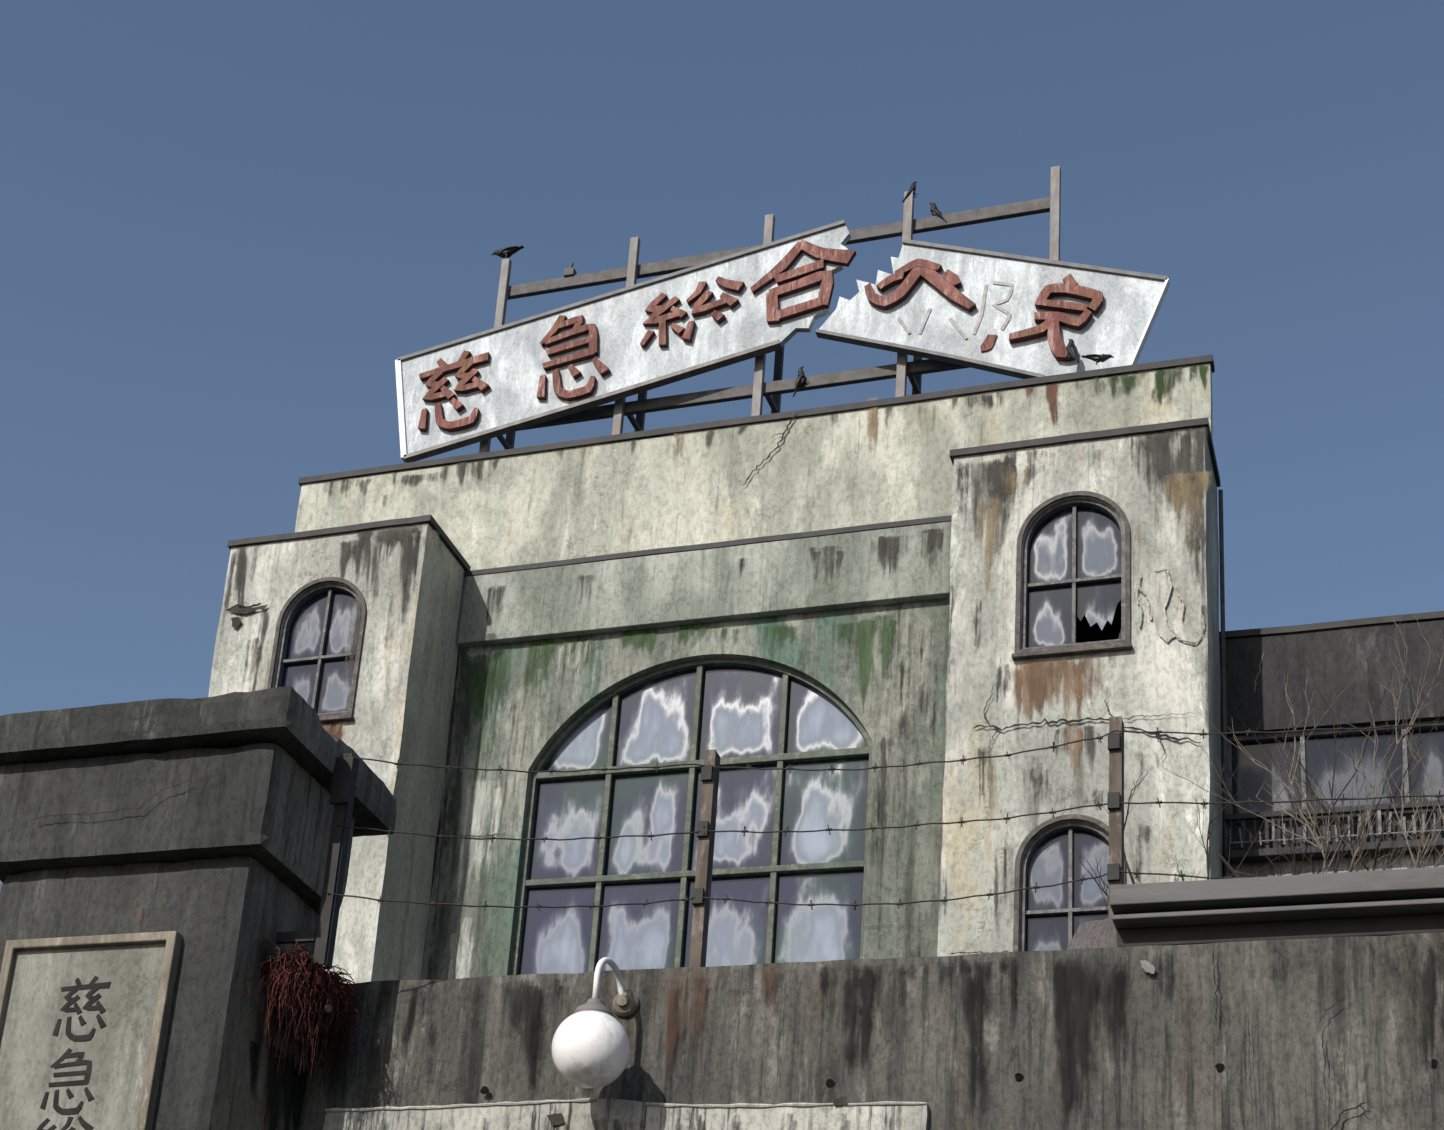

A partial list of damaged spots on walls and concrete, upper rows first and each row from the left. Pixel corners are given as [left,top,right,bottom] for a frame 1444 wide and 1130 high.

crack [742,413,798,486]
damp [958,448,1035,583]
damp [1138,426,1206,584]
peeling [1135,569,1205,645]
rust [321,723,343,739]
damp [436,661,506,898]
damp [876,719,905,857]
rust [1015,657,1099,721]
crack [973,661,1201,762]
damp [820,965,878,1065]
damp [939,959,1014,1107]
damp [1054,958,1126,1123]